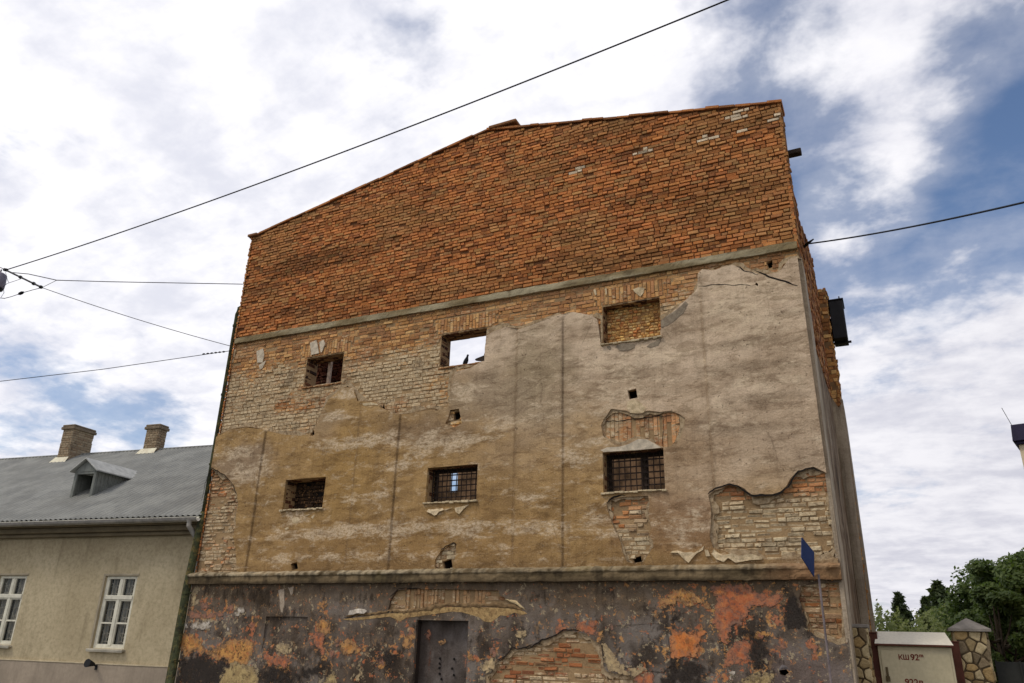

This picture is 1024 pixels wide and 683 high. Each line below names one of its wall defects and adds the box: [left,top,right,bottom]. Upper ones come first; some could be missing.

crack [707,266,797,286]
spalling [220,249,801,436]
spalling [601,391,685,448]
spalling [671,468,838,563]
water stain [278,587,293,612]
peeling [342,589,527,650]
water stain [784,596,807,630]
water stain [179,652,230,683]
crack [496,629,579,661]
spalling [463,620,654,683]
water stain [660,660,706,683]
mould [739,629,769,669]